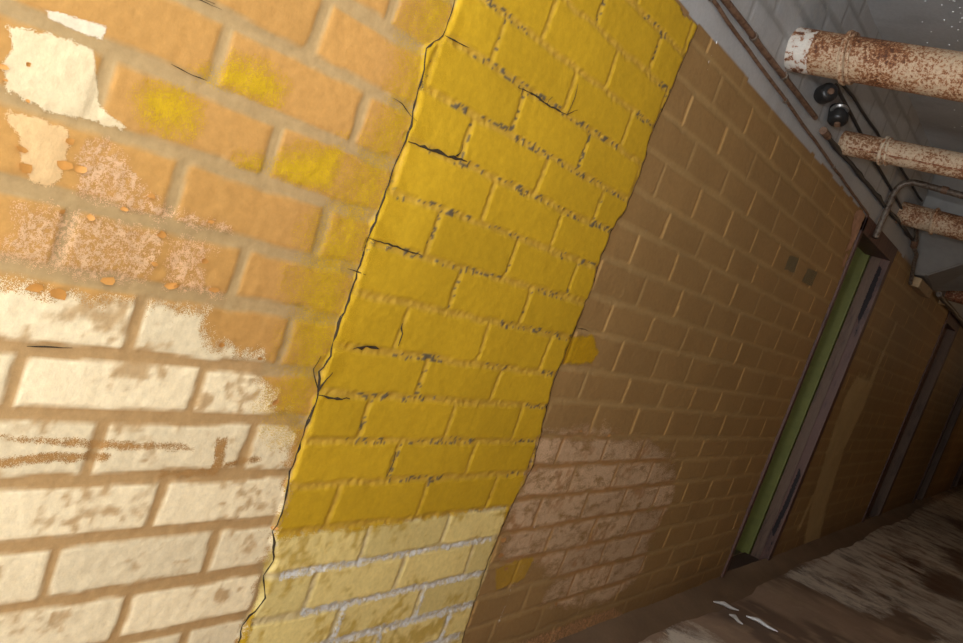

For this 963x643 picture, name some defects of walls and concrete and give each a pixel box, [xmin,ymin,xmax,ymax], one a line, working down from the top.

peeling [0,10,299,643]
crack [238,0,469,643]
crack [518,86,578,115]